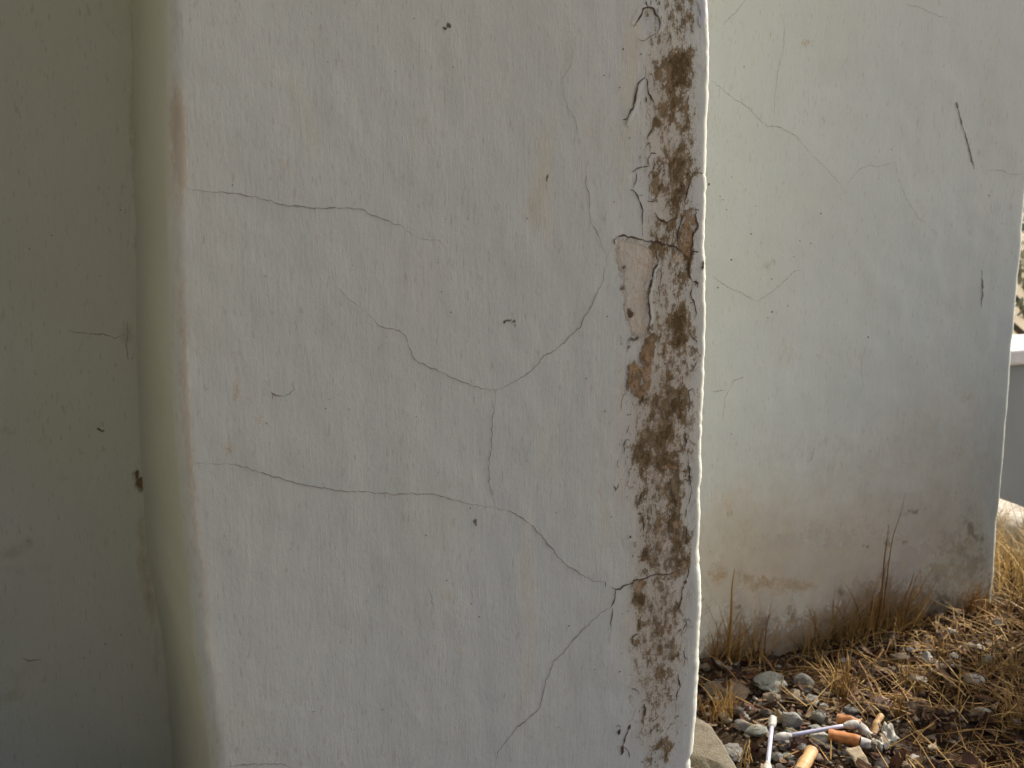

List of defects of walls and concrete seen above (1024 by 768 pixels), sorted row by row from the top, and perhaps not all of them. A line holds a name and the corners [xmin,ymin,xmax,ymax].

peeling [698,0,708,27]
crack [187,0,800,759]
peeling [616,238,657,398]